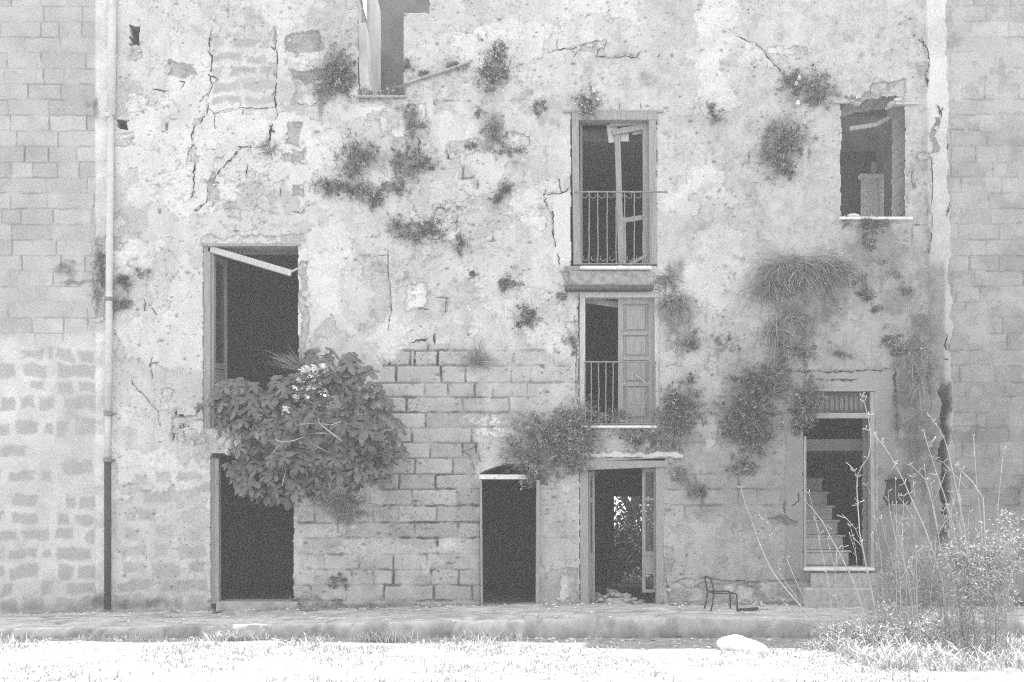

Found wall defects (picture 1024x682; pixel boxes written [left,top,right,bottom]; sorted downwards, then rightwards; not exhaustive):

spalling [285,31,322,51]
crack [552,40,658,58]
spalling [166,61,196,78]
crack [154,31,278,211]
peeling [463,416,509,437]
spalling [556,568,577,603]